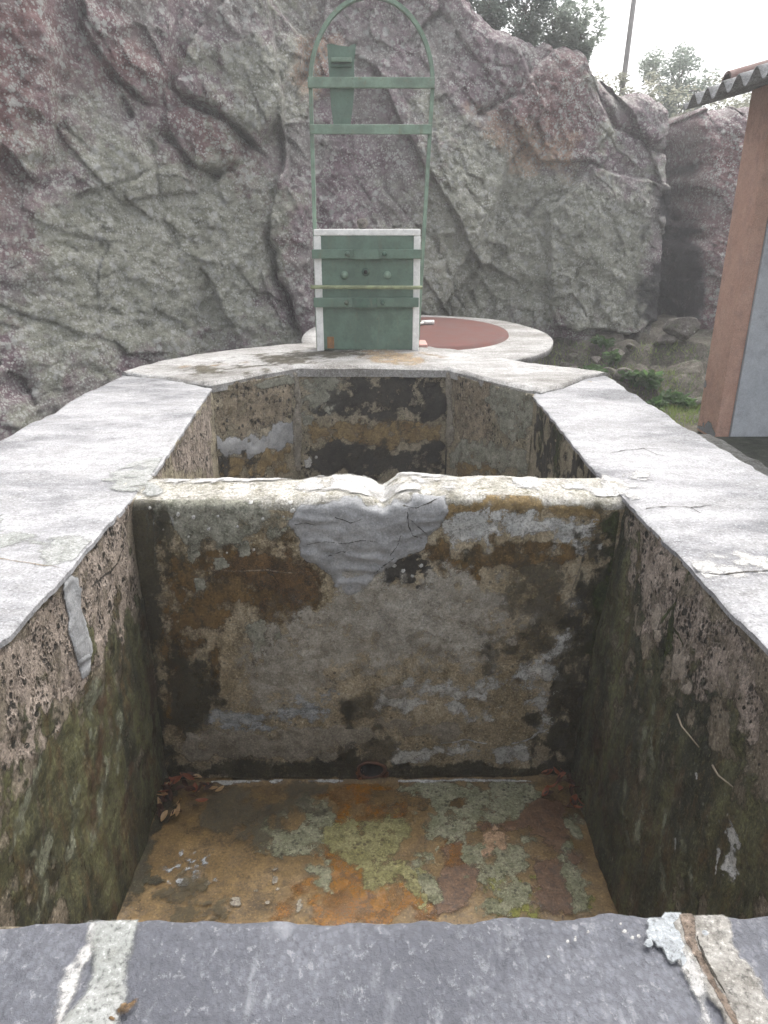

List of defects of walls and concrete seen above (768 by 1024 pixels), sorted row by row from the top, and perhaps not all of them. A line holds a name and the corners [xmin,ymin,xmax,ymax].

leakage [6,700,61,854]
leakage [31,783,80,921]
leakage [78,622,104,741]
leakage [90,711,123,842]
leakage [143,849,229,923]
corrosion [156,527,326,698]
corrosion [271,844,438,926]
corrosion [318,769,431,828]
leakage [156,401,650,856]
peeling [644,912,687,966]
leakage [692,693,748,756]
leakage [715,823,741,880]